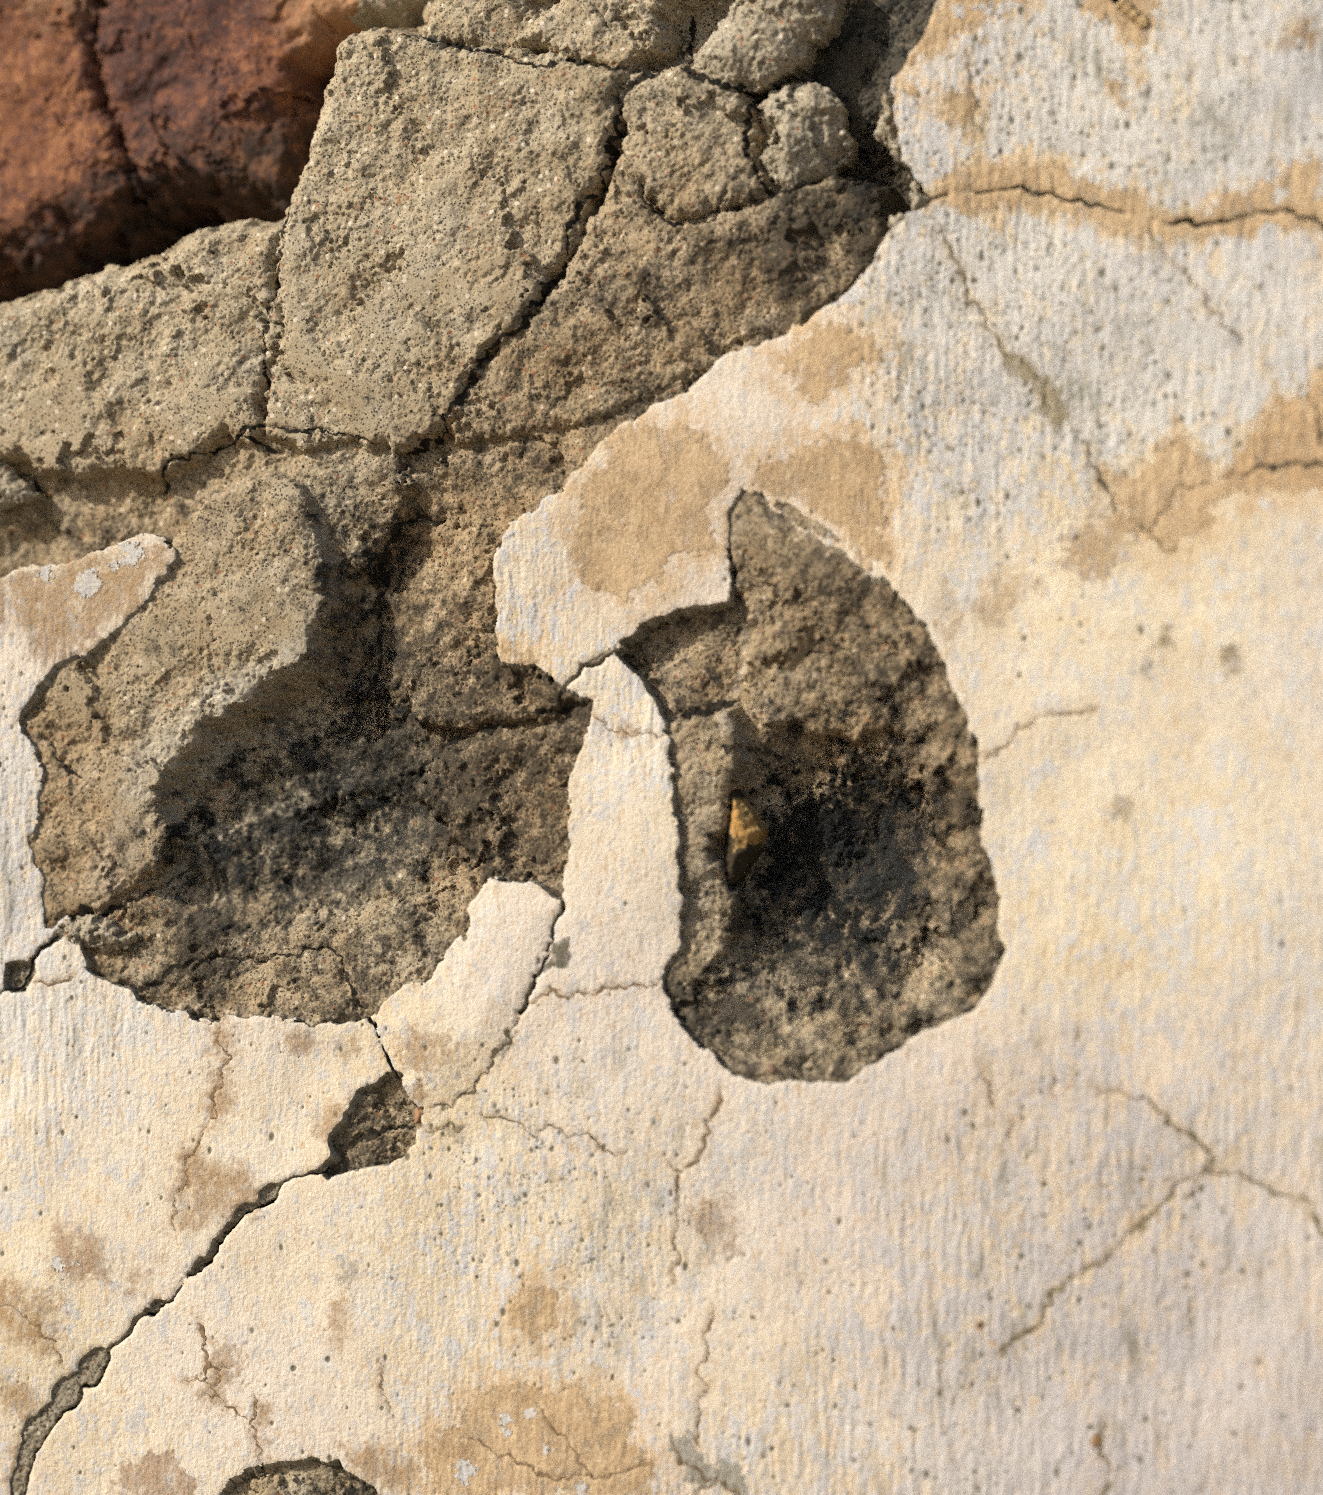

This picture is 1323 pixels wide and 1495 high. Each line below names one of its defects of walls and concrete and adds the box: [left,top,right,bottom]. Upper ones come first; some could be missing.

peeling [897,0,1029,96]
crack [162,17,847,495]
crack [4,870,189,992]
crack [124,946,400,1079]
spalling [22,474,594,1027]
damp [133,517,505,933]
spalling [328,1075,423,1177]
crack [194,981,659,1274]
spalling [572,422,1006,1084]
damp [705,733,970,1021]
crack [0,1300,262,1495]
spalling [229,1460,378,1495]